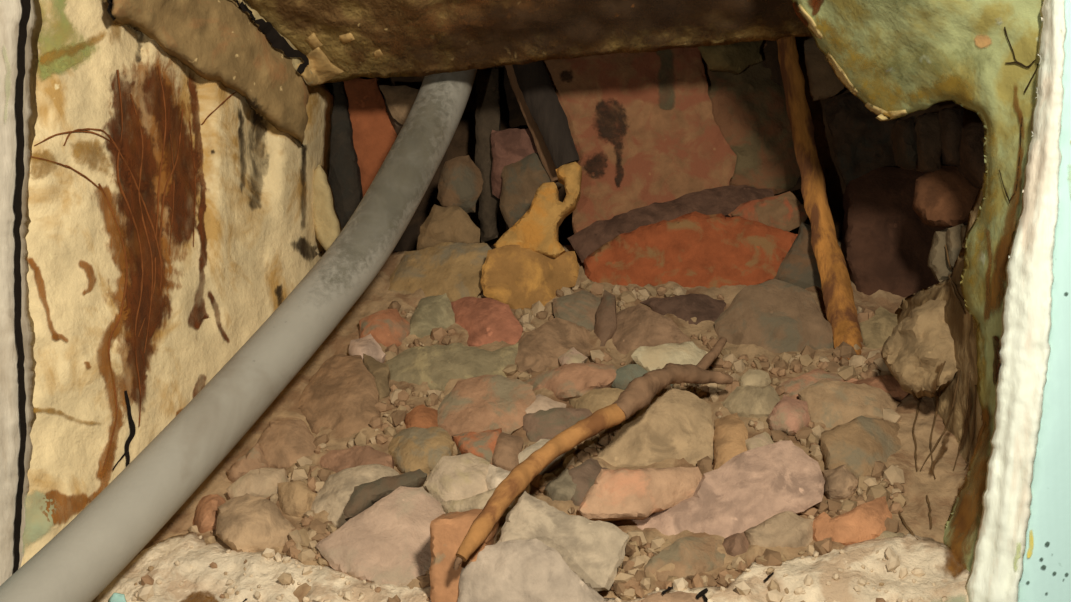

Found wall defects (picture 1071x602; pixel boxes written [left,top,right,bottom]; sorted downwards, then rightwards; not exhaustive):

spalling [297,33,344,86]
spalling [339,33,355,44]
rust [792,0,824,26]
peeling [313,165,342,251]
spalling [0,0,95,586]
rust [27,258,68,342]
rust [43,56,229,524]
peeling [792,0,1069,602]
rust [33,408,95,424]
crack [112,390,136,471]
rust [945,405,990,576]
peeling [108,593,126,602]